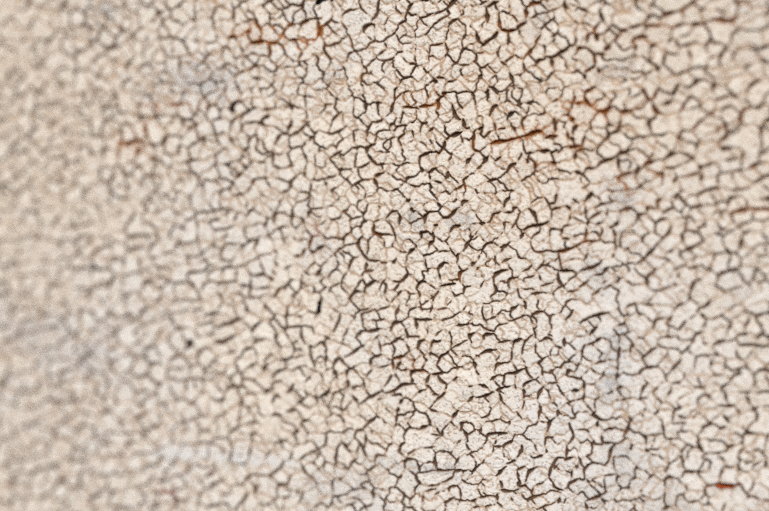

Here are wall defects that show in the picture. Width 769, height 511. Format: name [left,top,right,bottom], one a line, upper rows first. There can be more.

crack [32,0,197,105]
corrosion [227,21,330,55]
corrosion [561,90,642,128]
crack [744,45,769,72]
crack [0,43,326,301]
crack [122,0,749,459]
crack [379,118,769,511]
crack [0,270,330,511]
crack [273,408,393,511]